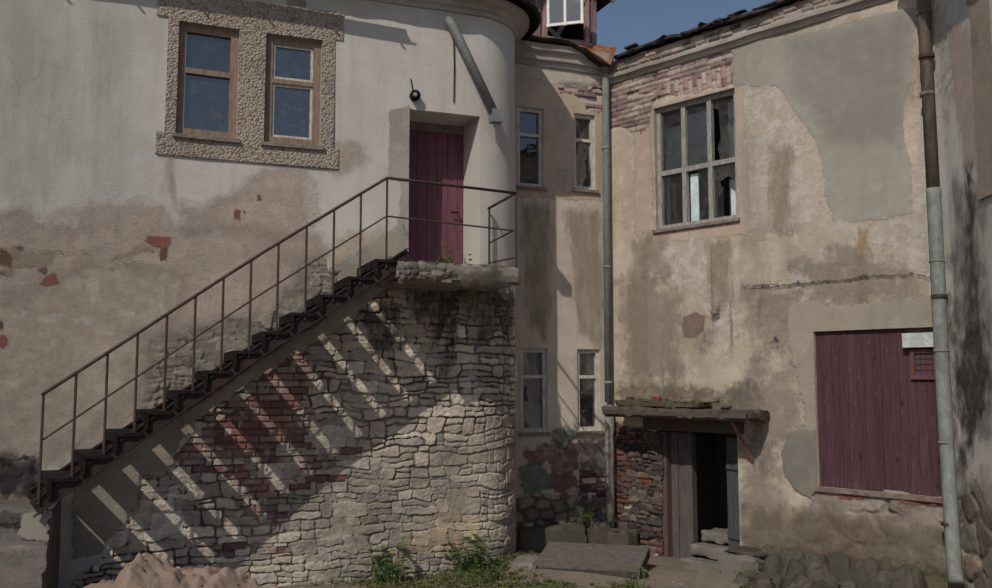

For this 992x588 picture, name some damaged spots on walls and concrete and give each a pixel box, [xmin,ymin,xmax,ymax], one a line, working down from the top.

peeling [0,105,458,560]
leakage [364,206,549,377]
peeling [515,52,992,588]
crack [710,251,930,353]
leakage [950,162,992,521]